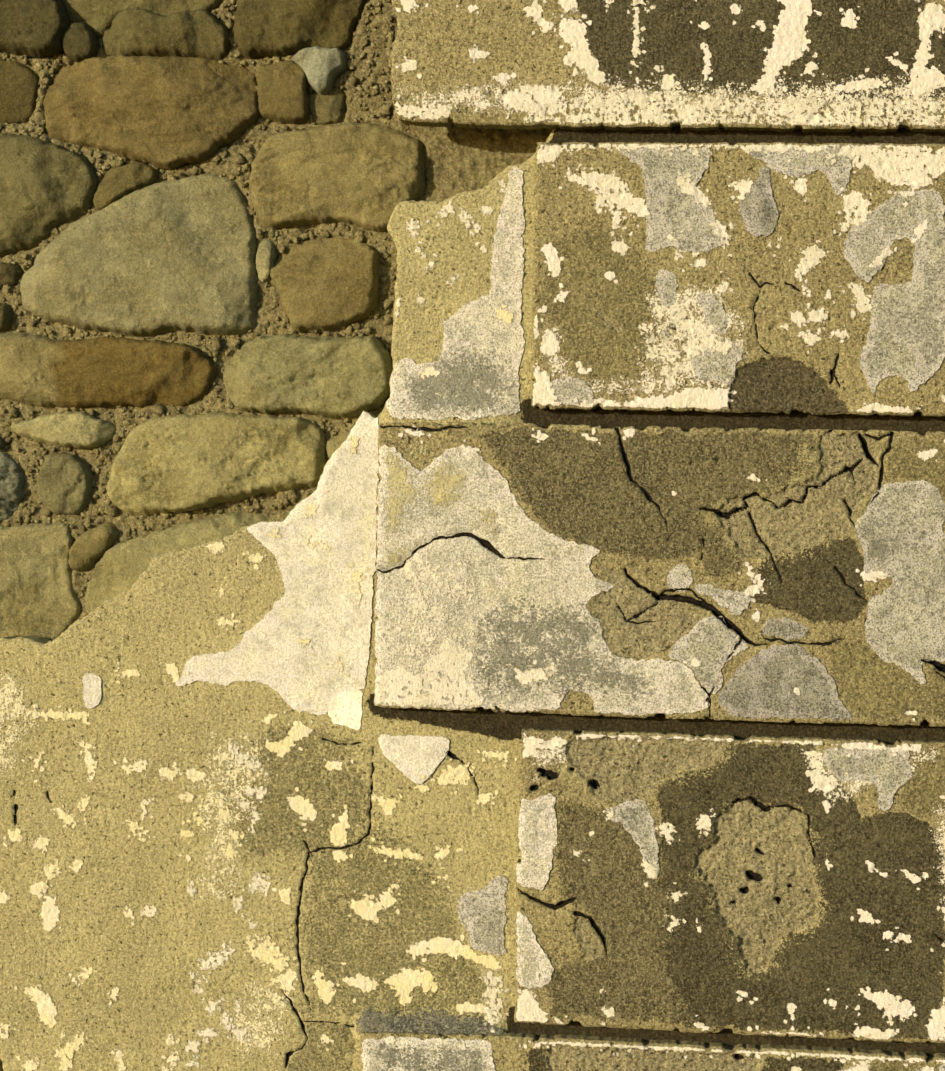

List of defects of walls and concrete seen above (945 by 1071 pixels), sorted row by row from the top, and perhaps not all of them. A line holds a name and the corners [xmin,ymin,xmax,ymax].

peeling [473,0,945,127]
crack [380,424,466,432]
crack [376,532,543,573]
peeling [114,143,945,864]
crack [617,569,841,660]
crack [699,431,895,582]
peeling [161,871,299,1071]
crack [282,738,375,1068]
spalling [312,733,734,1071]
crack [518,888,607,954]
spalling [695,799,833,975]
peeling [823,986,945,1041]